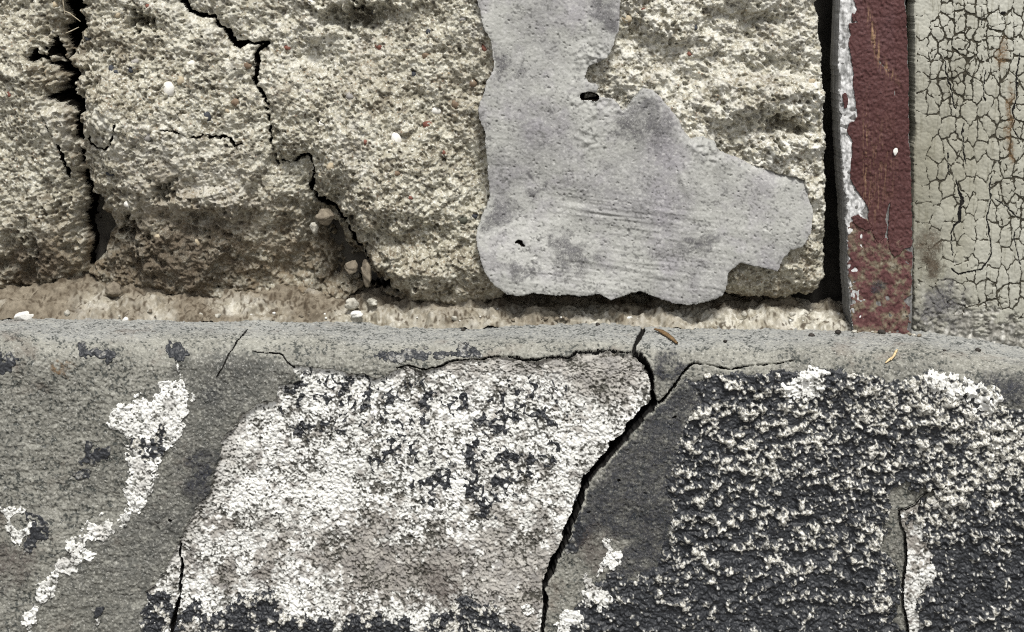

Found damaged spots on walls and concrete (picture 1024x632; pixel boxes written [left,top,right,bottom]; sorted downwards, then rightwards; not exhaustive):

crack [28,0,116,265]
crack [160,130,243,147]
crack [181,0,397,292]
peeling [842,0,913,334]
crack [216,329,295,377]
peeling [21,604,39,632]
peeling [22,510,50,555]
peeling [117,424,167,528]
spalling [145,340,651,632]
crack [397,328,792,632]
crack [898,488,939,632]
peeling [900,500,937,632]